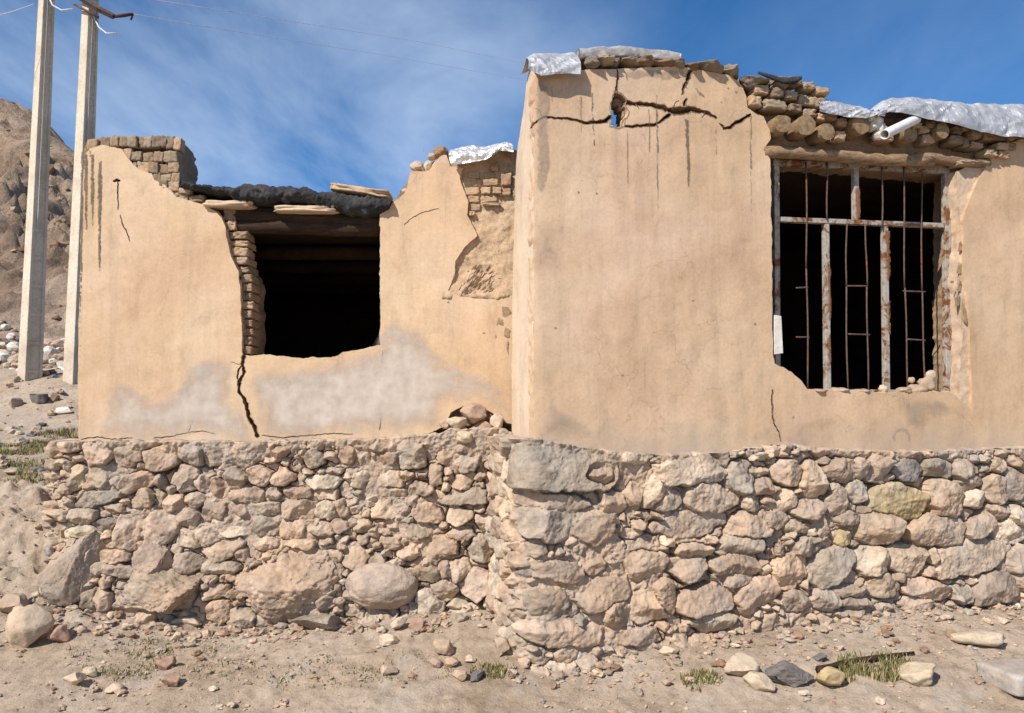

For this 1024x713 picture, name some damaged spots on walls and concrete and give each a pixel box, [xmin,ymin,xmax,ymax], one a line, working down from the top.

crack [530,68,751,130]
leakage [79,152,102,312]
crack [113,178,130,241]
spalling [223,209,262,355]
spalling [442,150,517,354]
rust [886,223,937,280]
crack [81,425,215,440]
crack [234,354,350,438]
crack [771,389,781,442]